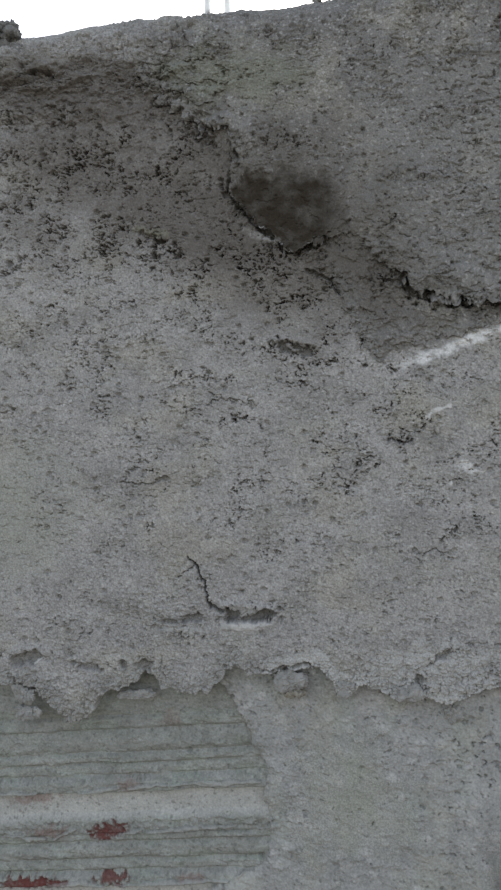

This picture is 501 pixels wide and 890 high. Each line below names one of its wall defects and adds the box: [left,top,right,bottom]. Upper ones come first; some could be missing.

crack [178,556,227,614]
flaking render [16,815,141,844]
flaking render [0,870,71,890]
flaking render [91,867,138,889]